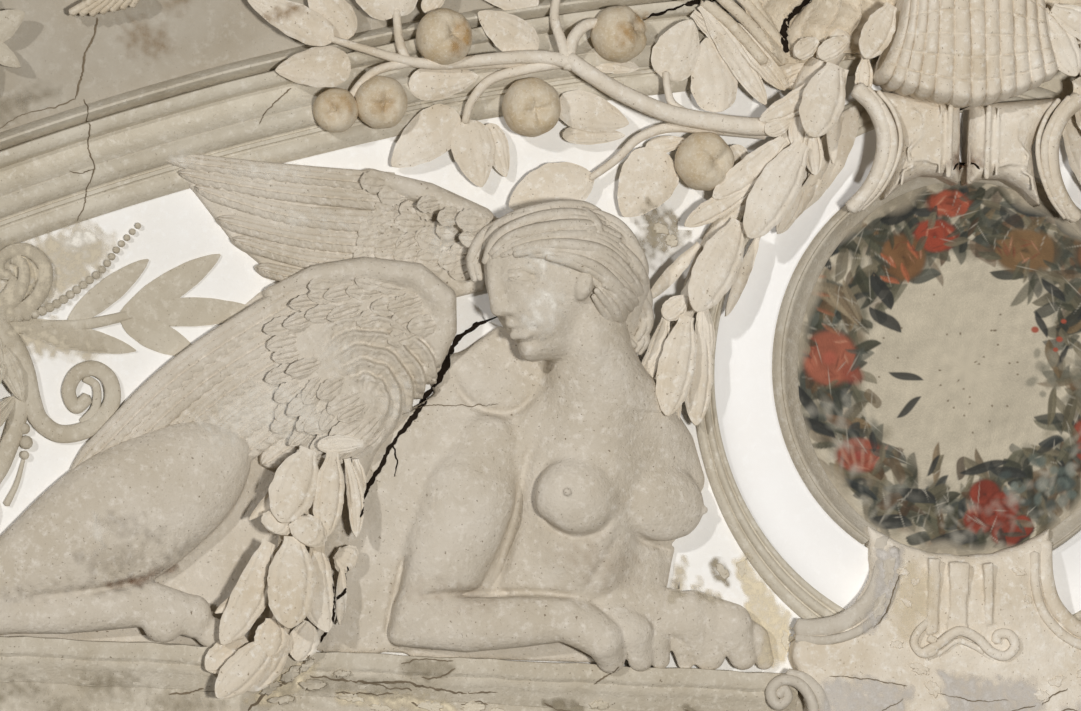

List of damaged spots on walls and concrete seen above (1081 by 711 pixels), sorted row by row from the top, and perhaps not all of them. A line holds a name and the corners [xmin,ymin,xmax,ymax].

crack [1,18,98,221]
crack [780,0,812,53]
crack [360,316,497,518]